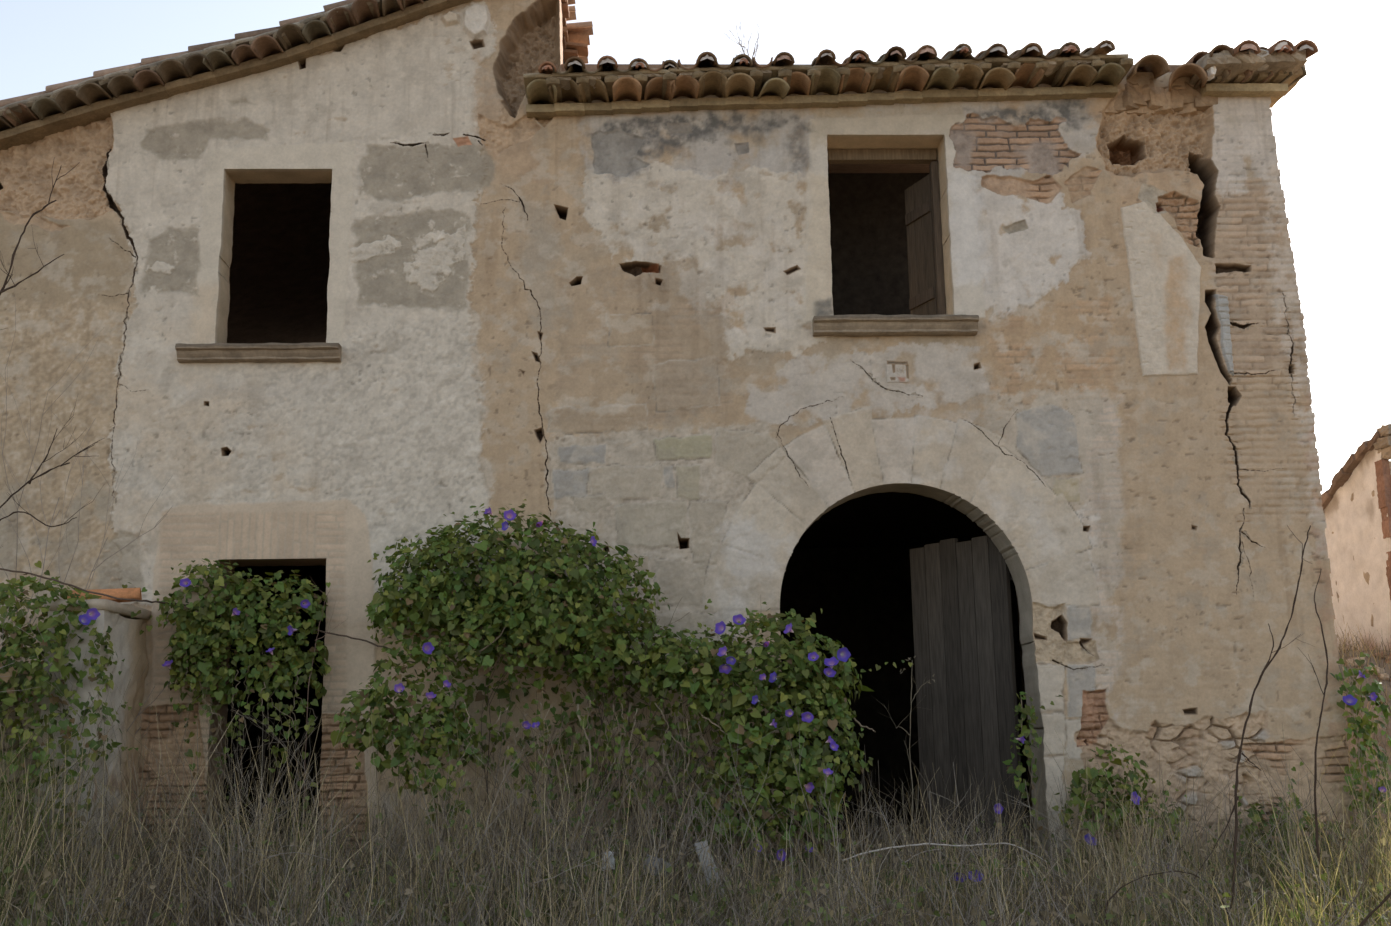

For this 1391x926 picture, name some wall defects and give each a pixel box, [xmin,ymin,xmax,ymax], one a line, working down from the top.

crack [92,144,153,509]
spalling [0,92,277,239]
flaking render [340,0,566,320]
crack [386,128,556,535]
crack [771,355,927,492]
crack [959,405,1050,491]
flaking render [941,79,1221,380]
flaking render [1032,598,1357,879]